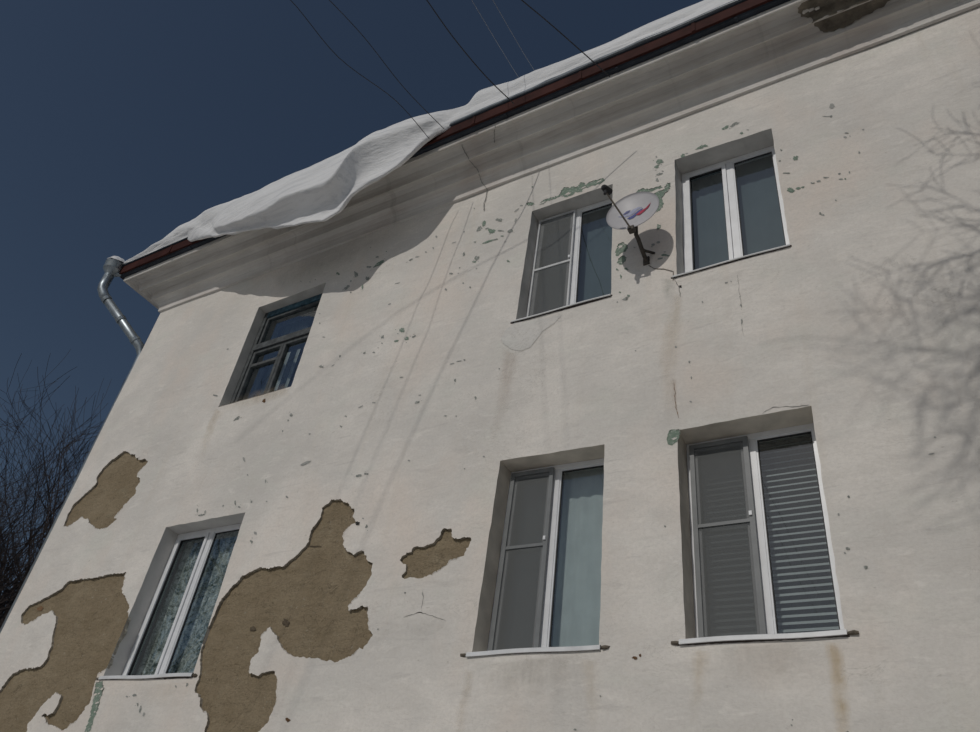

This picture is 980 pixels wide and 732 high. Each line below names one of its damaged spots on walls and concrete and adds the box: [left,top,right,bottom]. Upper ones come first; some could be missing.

peeling [463,178,605,269]
peeling [637,156,670,212]
flaking render [64,452,148,529]
flaking render [402,530,471,579]
flaking render [0,572,129,732]
flaking render [175,499,378,732]